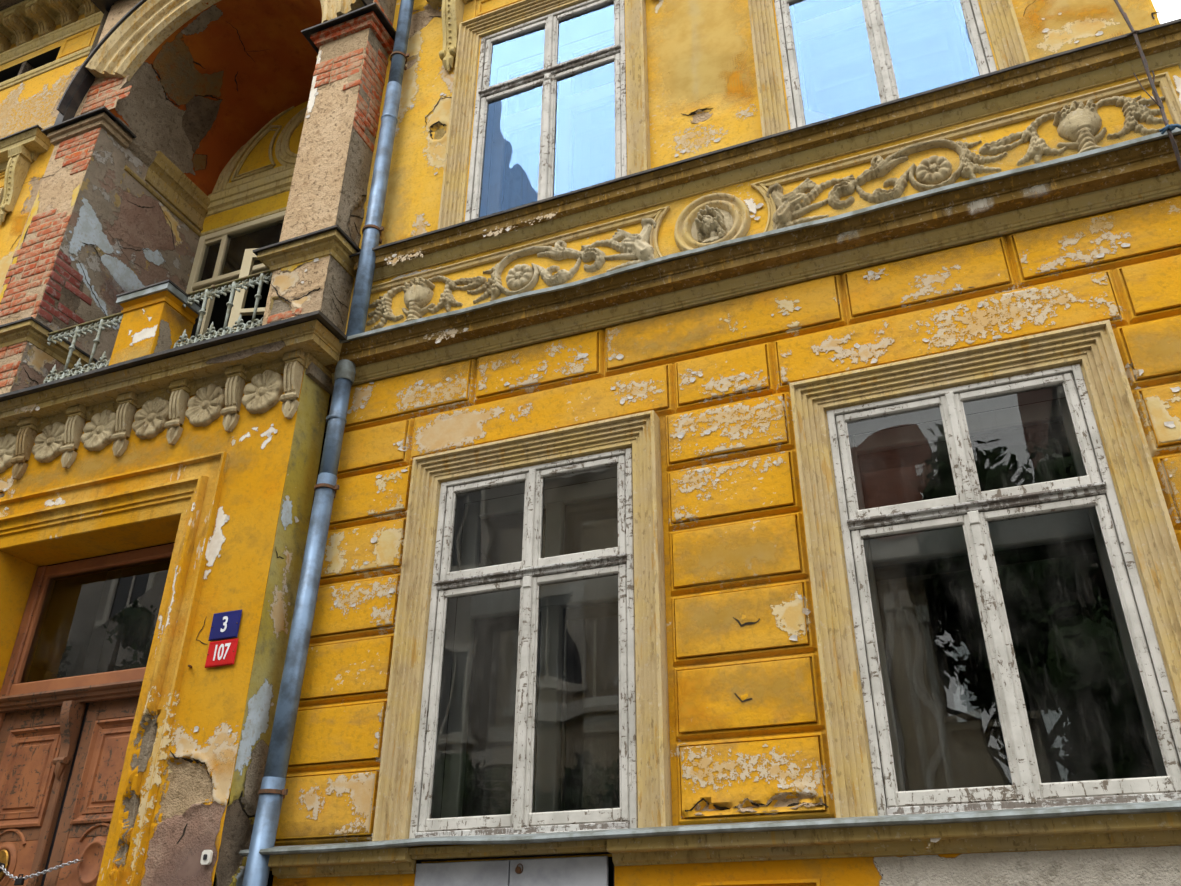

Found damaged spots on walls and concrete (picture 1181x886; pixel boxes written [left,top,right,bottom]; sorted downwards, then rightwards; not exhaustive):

flaking render [81,5,224,175]
flaking render [305,28,389,152]
peeling [422,65,454,175]
peeling [1036,13,1120,54]
flaking render [0,127,172,353]
peeling [267,255,329,324]
peeling [423,328,469,343]
peeling [899,216,1132,356]
peeling [391,340,592,455]
flaking render [113,678,274,886]
peeling [673,743,833,820]
flaking render [874,838,1181,886]